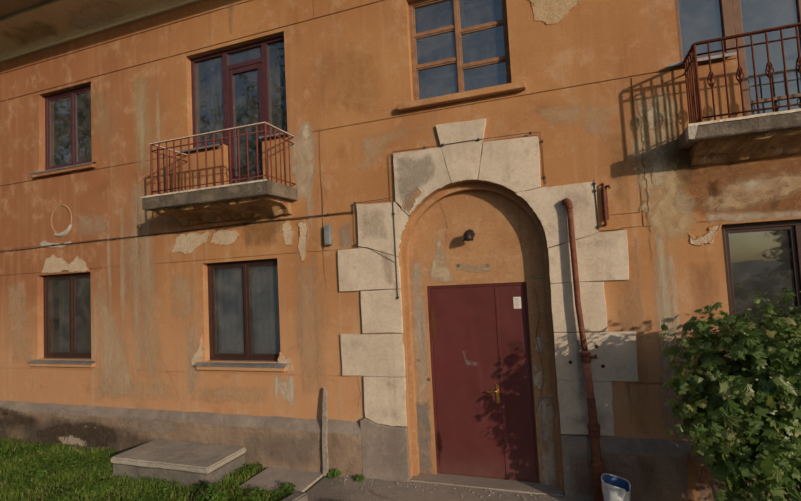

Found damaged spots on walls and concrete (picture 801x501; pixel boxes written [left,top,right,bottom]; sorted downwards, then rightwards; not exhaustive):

peeling [528,0,580,25]
peeling [646,107,656,129]
crack [635,91,655,261]
water stain [707,173,801,221]
peeling [38,240,89,274]
peeling [172,229,240,256]
peeling [281,219,309,262]
water stain [630,95,695,374]
peeling [687,222,722,247]